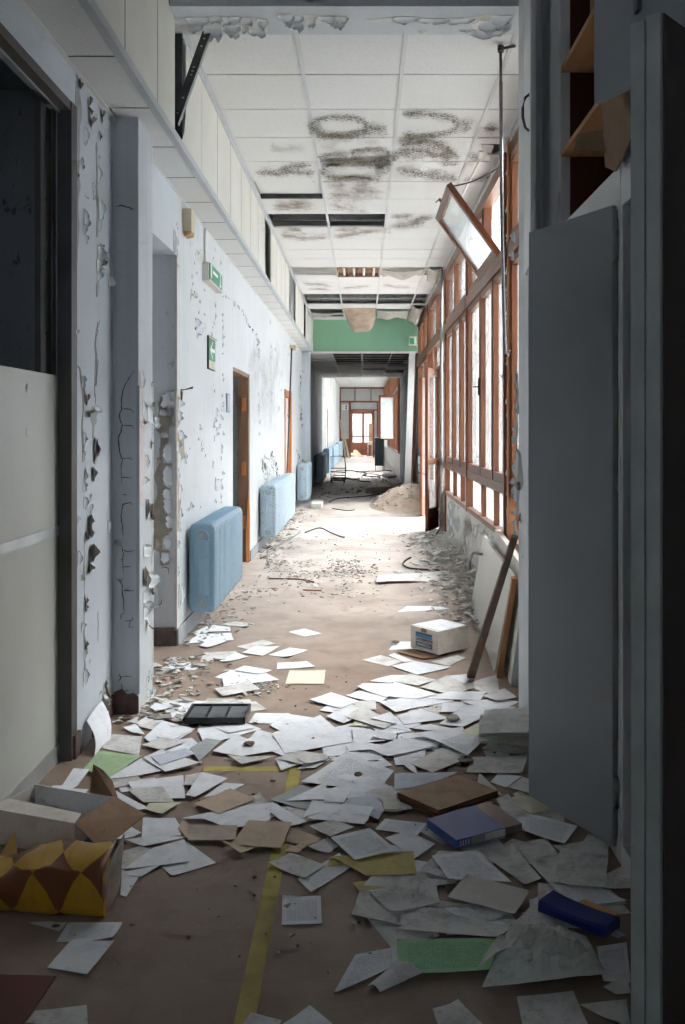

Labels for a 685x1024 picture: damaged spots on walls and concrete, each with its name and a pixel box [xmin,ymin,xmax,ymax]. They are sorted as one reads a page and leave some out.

peeling [174,13,349,42]
peeling [365,14,512,40]
peeling [75,78,117,297]
leakage [256,111,491,196]
leakage [393,214,432,230]
peeling [77,323,103,687]
crack [117,369,135,628]
peeling [139,370,225,629]
peeling [261,451,280,484]